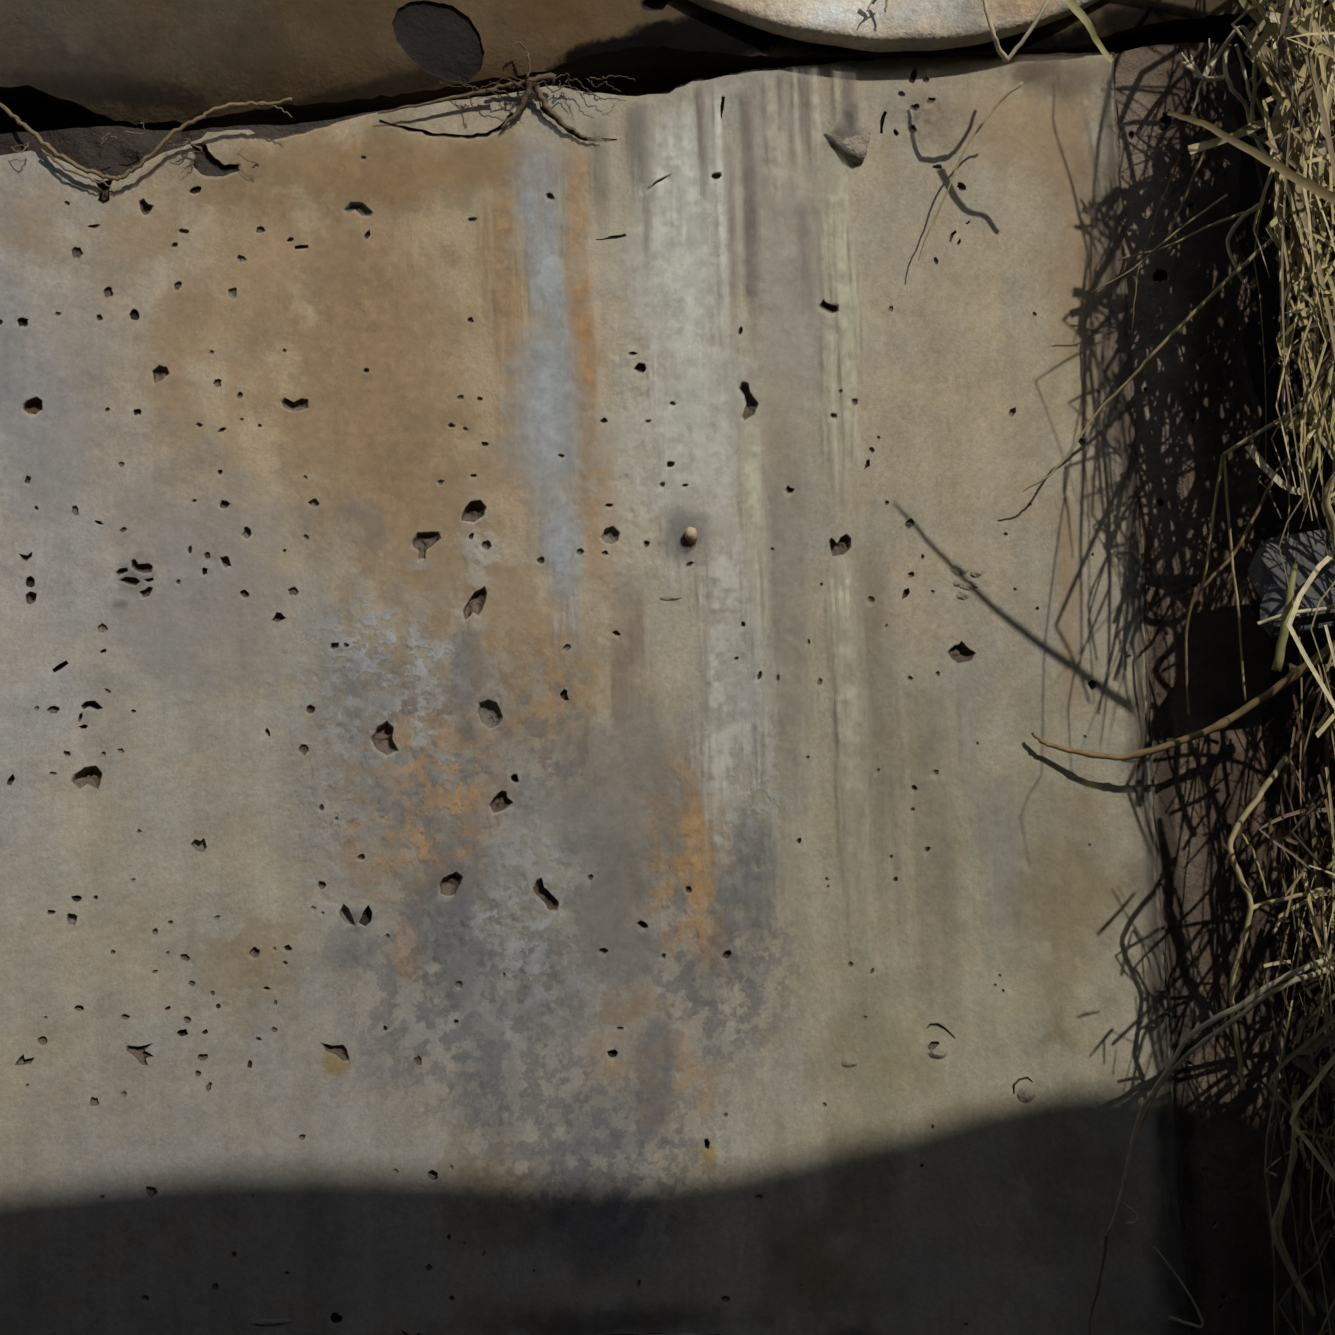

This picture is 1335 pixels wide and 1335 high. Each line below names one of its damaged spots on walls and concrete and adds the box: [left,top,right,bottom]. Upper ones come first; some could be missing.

spalling [189,143,243,178]
water stain [648,85,726,483]
water stain [836,235,854,393]
water stain [528,359,567,465]
water stain [743,446,761,527]
water stain [304,600,469,834]
corrosion [348,729,482,876]
water stain [408,809,582,1061]
corrosion [654,795,719,949]
water stain [689,540,779,870]
water stain [838,684,866,796]
water stain [518,1099,667,1217]